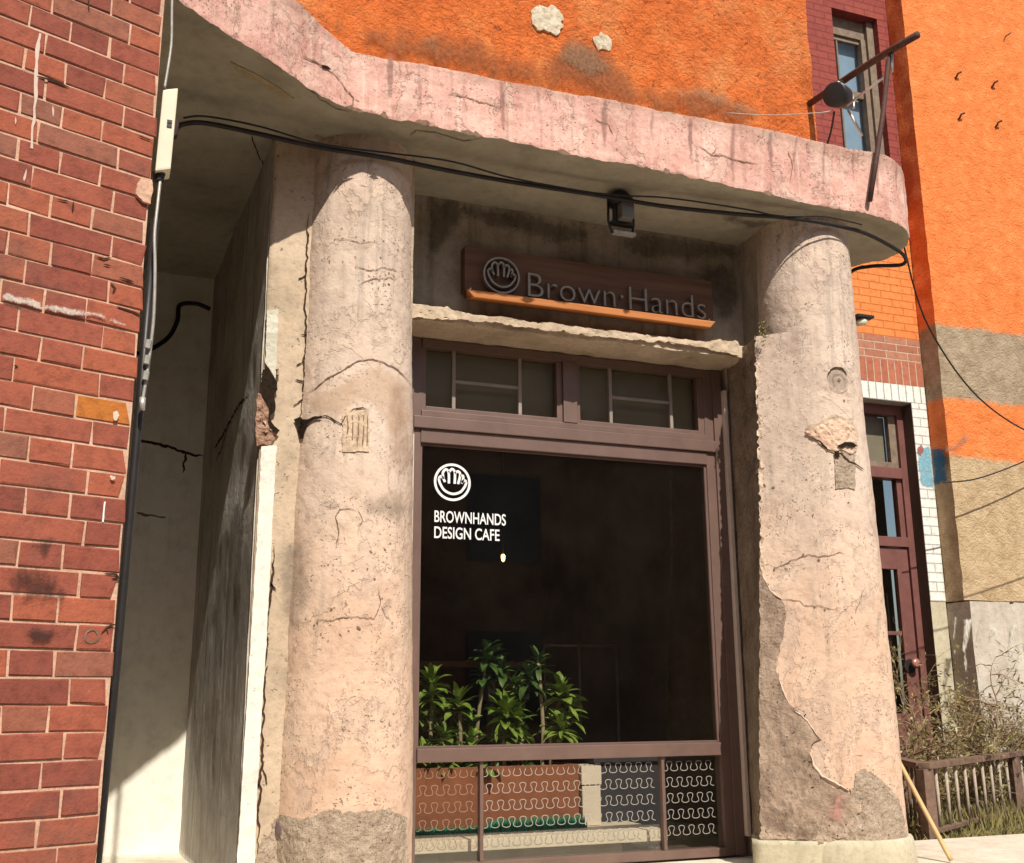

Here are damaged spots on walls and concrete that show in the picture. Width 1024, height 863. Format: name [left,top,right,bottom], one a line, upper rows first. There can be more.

peeling [530,5,564,36]
peeling [592,32,612,51]
leakage [30,33,41,149]
leakage [3,293,122,324]
crack [294,214,410,417]
crack [141,397,248,472]
spalling [237,366,408,863]
crack [775,552,841,569]
spalling [754,337,907,845]